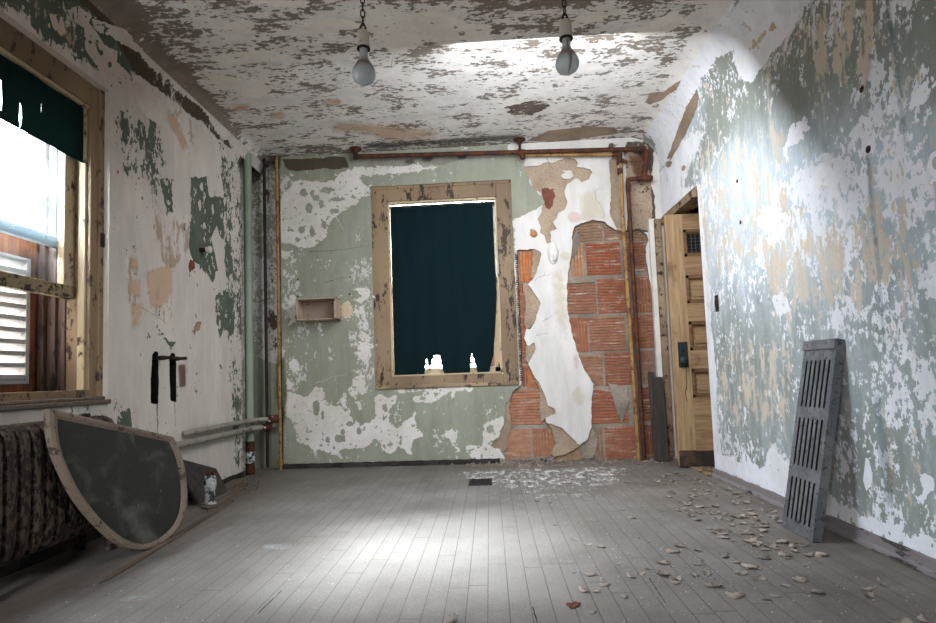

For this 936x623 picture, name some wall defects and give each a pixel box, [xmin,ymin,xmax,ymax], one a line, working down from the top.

peeling [48,6,148,86]
peeling [288,0,498,55]
peeling [732,11,801,82]
peeling [504,100,550,116]
spalling [528,126,618,142]
peeling [188,176,236,282]
peeling [279,148,507,259]
peeling [215,290,236,338]
flaking render [443,152,656,462]
peeling [285,358,473,455]
peeling [716,444,789,497]
peeling [826,491,936,559]